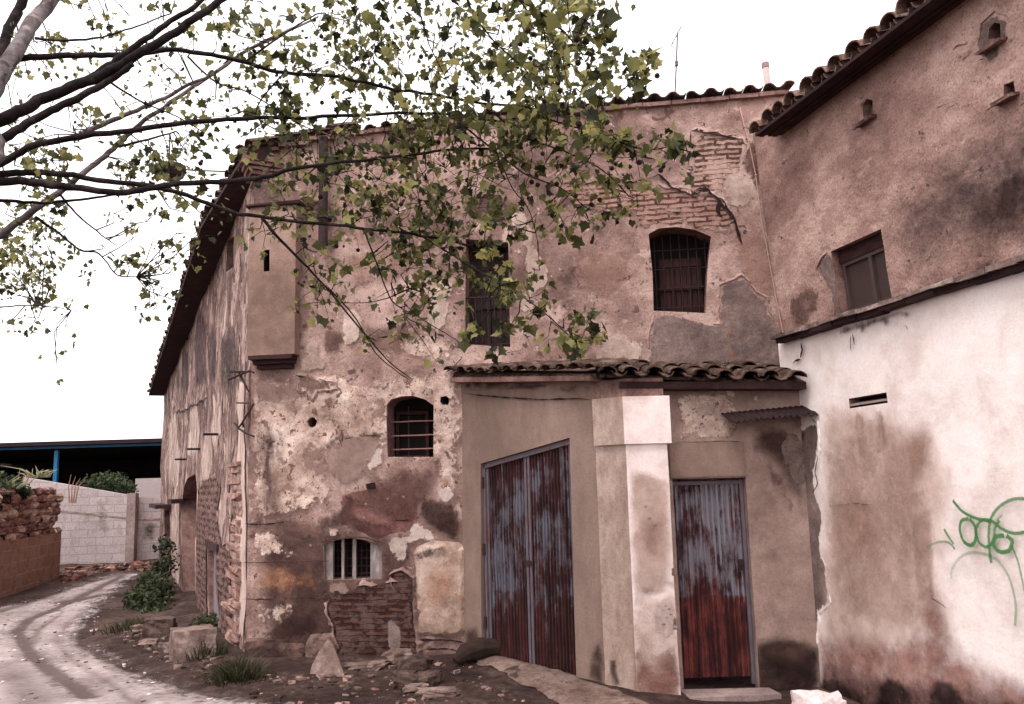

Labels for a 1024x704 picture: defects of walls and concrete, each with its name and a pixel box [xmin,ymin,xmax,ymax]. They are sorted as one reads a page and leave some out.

flaking render [561,127,751,235]
crack [632,155,742,244]
flaking render [296,376,338,418]
flaking render [326,437,379,490]
flaking render [800,419,821,475]
flaking render [196,472,231,636]
damp [254,470,459,653]
damp [758,414,1024,704]
flaking render [323,566,423,656]